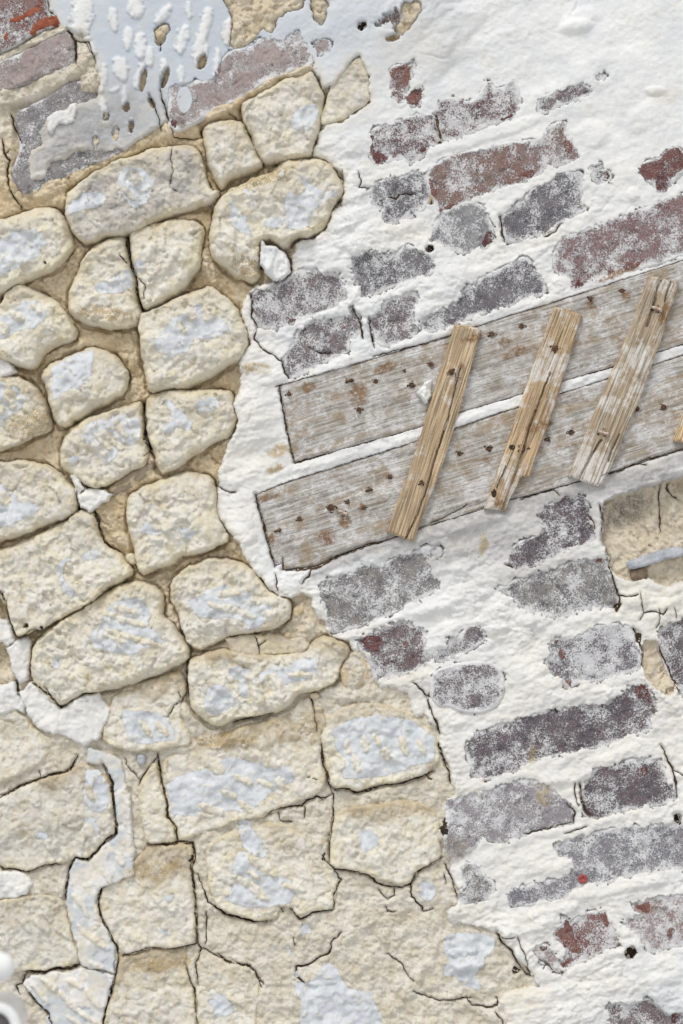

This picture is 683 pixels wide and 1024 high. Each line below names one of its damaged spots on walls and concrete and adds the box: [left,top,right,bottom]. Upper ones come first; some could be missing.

spalling [3,3,60,40]
spalling [390,65,422,104]
flaking render [47,103,77,136]
spalling [370,135,388,164]
flaking render [228,189,291,282]
spalling [482,231,496,247]
corrosion [317,517,350,545]
spalling [361,635,381,651]
crack [0,680,458,1024]
spalling [555,920,581,967]
peeling [294,963,383,1024]
crack [387,953,503,1022]